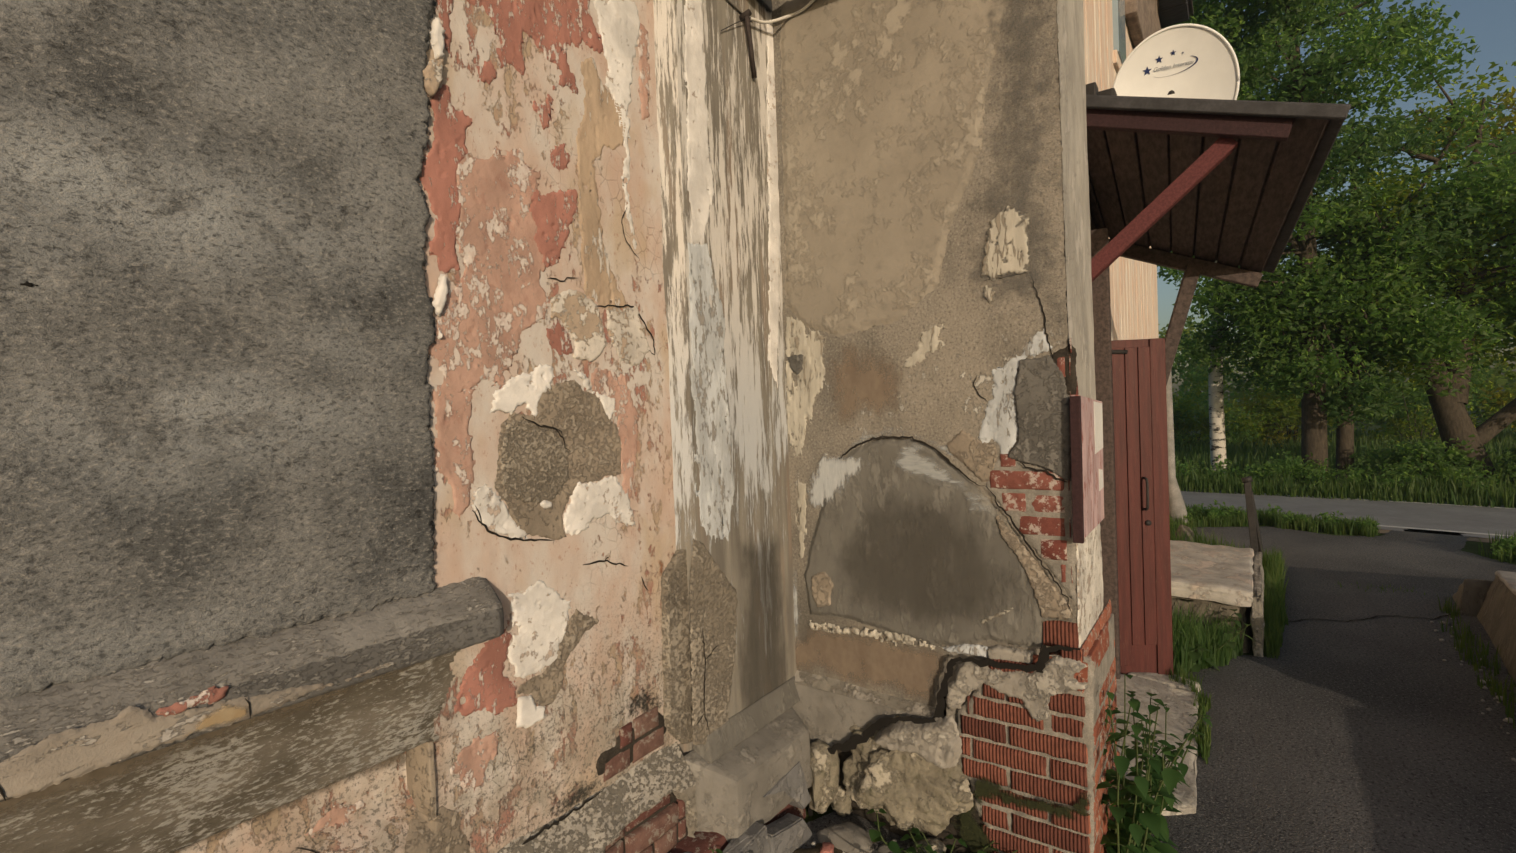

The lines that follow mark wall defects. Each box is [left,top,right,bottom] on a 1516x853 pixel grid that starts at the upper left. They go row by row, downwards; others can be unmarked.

damp [756,0,772,13]
peeling [419,0,651,540]
flaking render [1053,338,1079,396]
crack [827,435,1080,754]
flaking render [947,429,1104,652]
flaking render [516,609,599,729]
flaking render [596,538,738,782]
flaking render [0,662,396,801]
flaking render [404,806,470,853]
peeling [450,731,502,791]
crack [522,787,605,845]
flaking render [605,792,688,853]